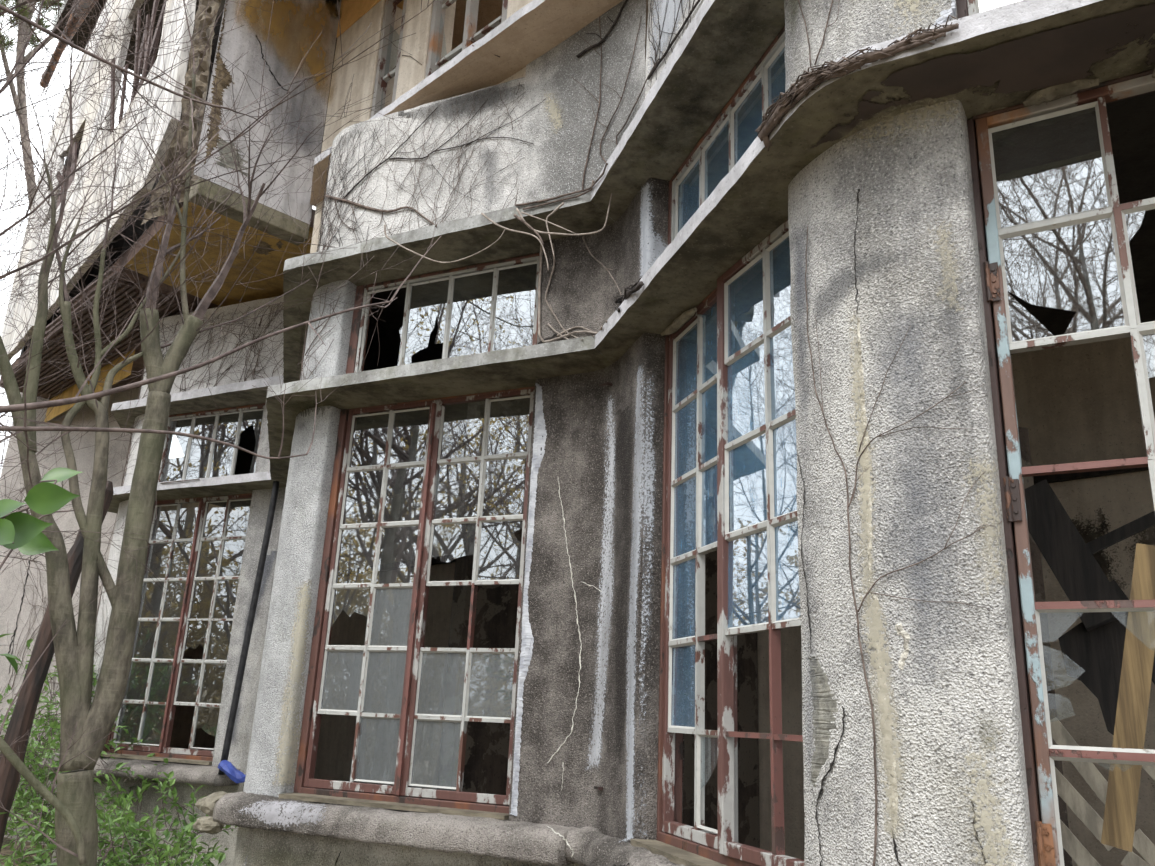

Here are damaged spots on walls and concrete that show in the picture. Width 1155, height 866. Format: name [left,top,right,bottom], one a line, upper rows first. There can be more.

water stain [238,0,328,88]
water stain [444,87,497,118]
water stain [639,183,668,278]
crack [852,189,860,315]
water stain [588,395,616,769]
water stain [619,370,656,842]
crack [812,706,845,866]
crack [890,828,902,866]
crack [971,801,986,865]